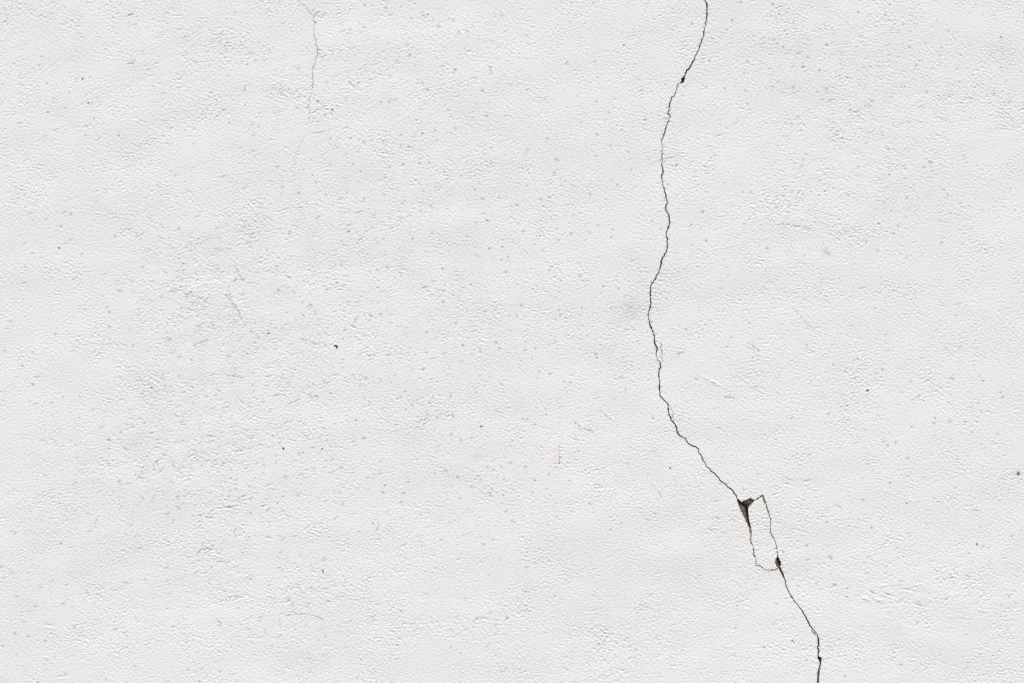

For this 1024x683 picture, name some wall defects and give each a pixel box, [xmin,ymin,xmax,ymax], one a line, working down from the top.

crack [648,0,821,683]